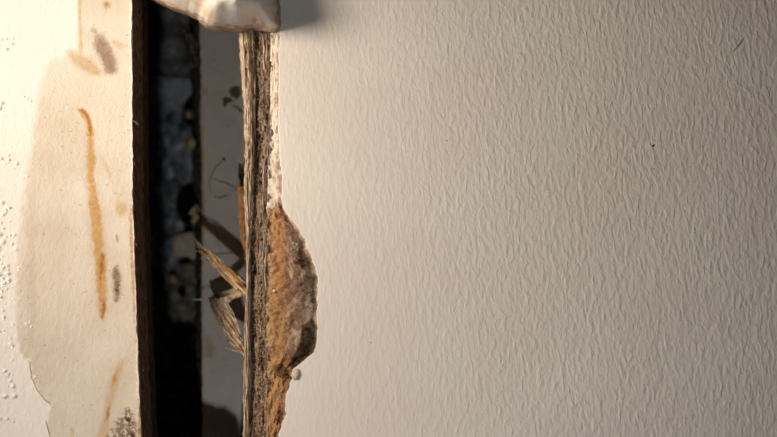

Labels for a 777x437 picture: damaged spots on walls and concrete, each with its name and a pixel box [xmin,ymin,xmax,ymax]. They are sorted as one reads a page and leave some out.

peeling [13,0,141,437]
spalling [189,16,203,437]
spalling [222,19,283,437]